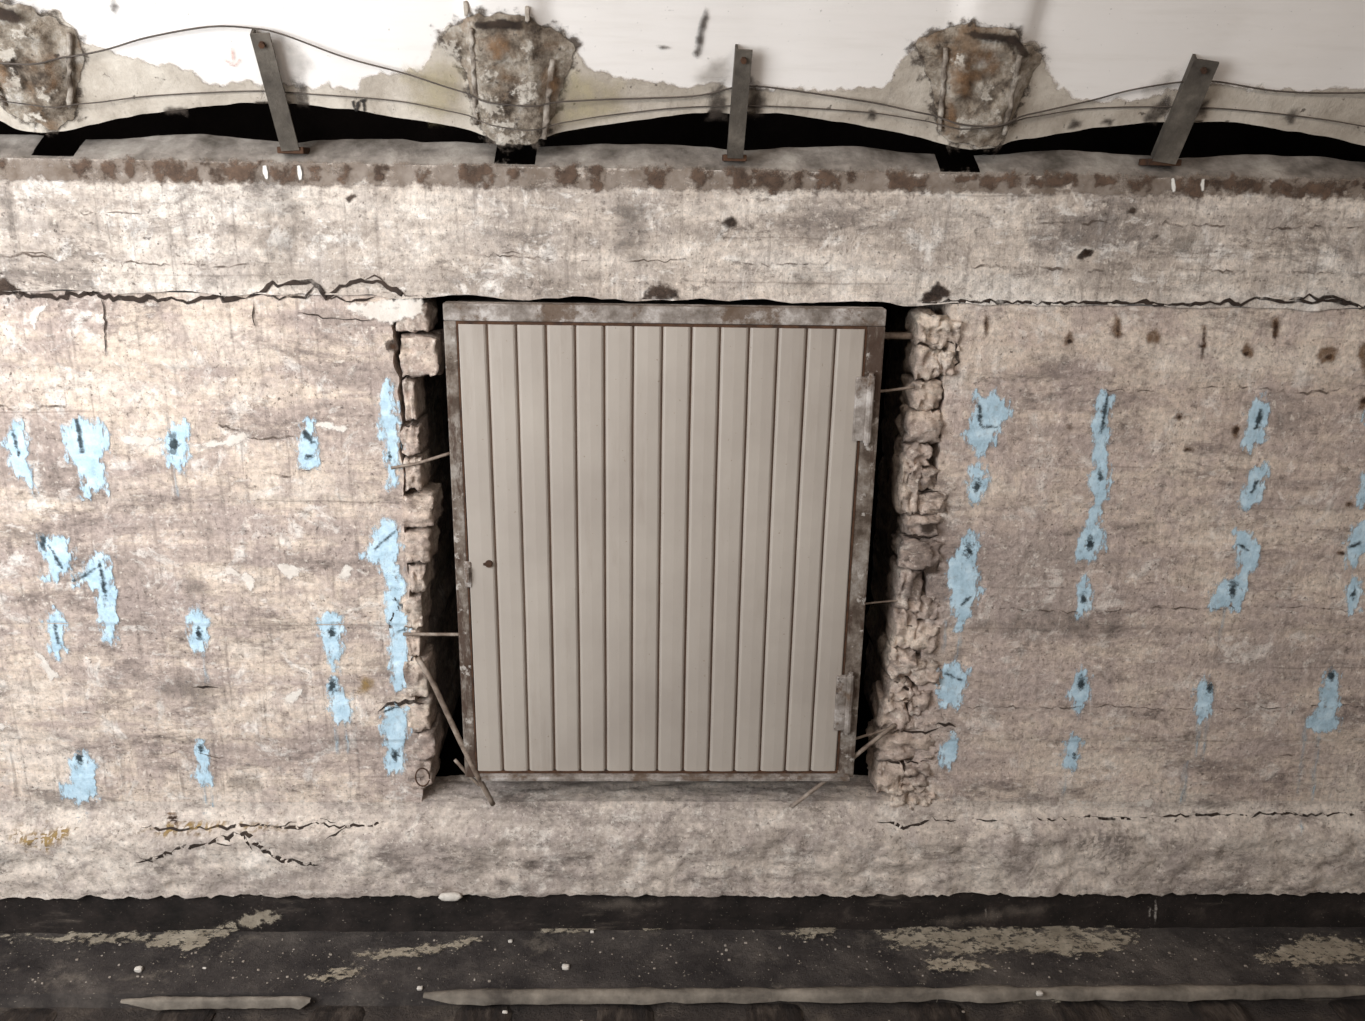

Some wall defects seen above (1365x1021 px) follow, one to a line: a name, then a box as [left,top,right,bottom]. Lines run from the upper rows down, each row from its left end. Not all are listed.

spalling [0,0,268,134]
spalling [283,1,732,152]
spalling [747,18,1178,151]
peeling [1194,84,1365,146]
crack [7,252,55,260]
crack [0,260,411,354]
crack [922,264,1365,310]
crack [947,341,960,366]
rust [1318,347,1336,363]
crack [903,534,938,572]
crack [136,818,384,866]